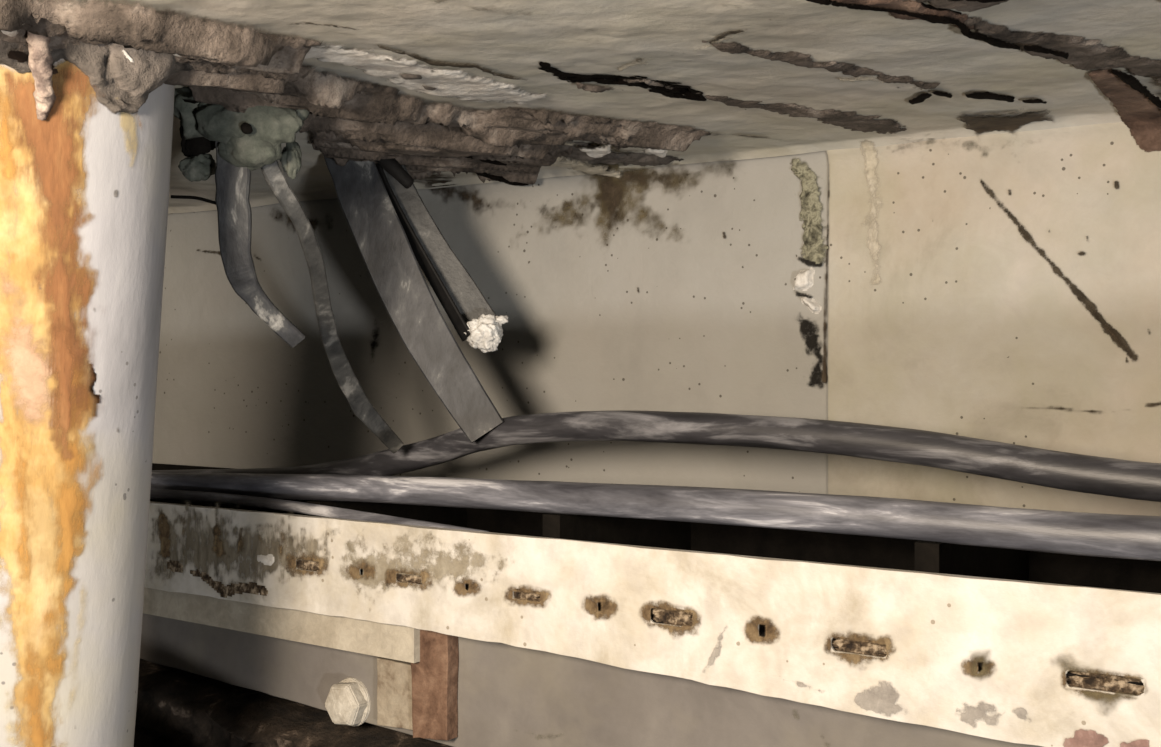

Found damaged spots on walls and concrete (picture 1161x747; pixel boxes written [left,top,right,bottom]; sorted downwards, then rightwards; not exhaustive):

spalling [0,0,720,186]
crack [379,46,907,134]
crack [806,0,1161,152]
leakage [414,174,489,210]
crack [980,180,1137,361]
rust [0,60,98,747]
leakage [158,513,184,559]
leakage [341,534,485,592]
rust [832,634,887,665]
peeling [854,682,902,716]
rust [1062,661,1144,705]
peeling [1063,729,1149,747]